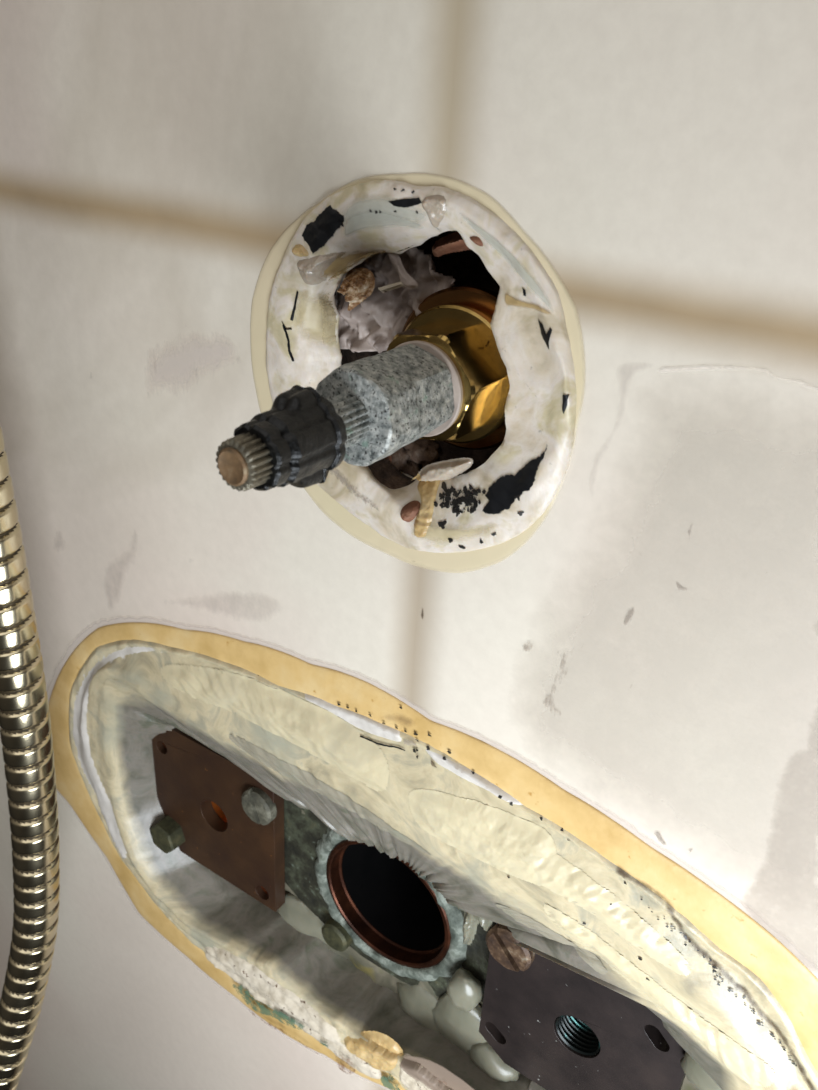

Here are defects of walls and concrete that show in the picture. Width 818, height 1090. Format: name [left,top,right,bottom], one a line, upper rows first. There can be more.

water stain [434,445,547,549]